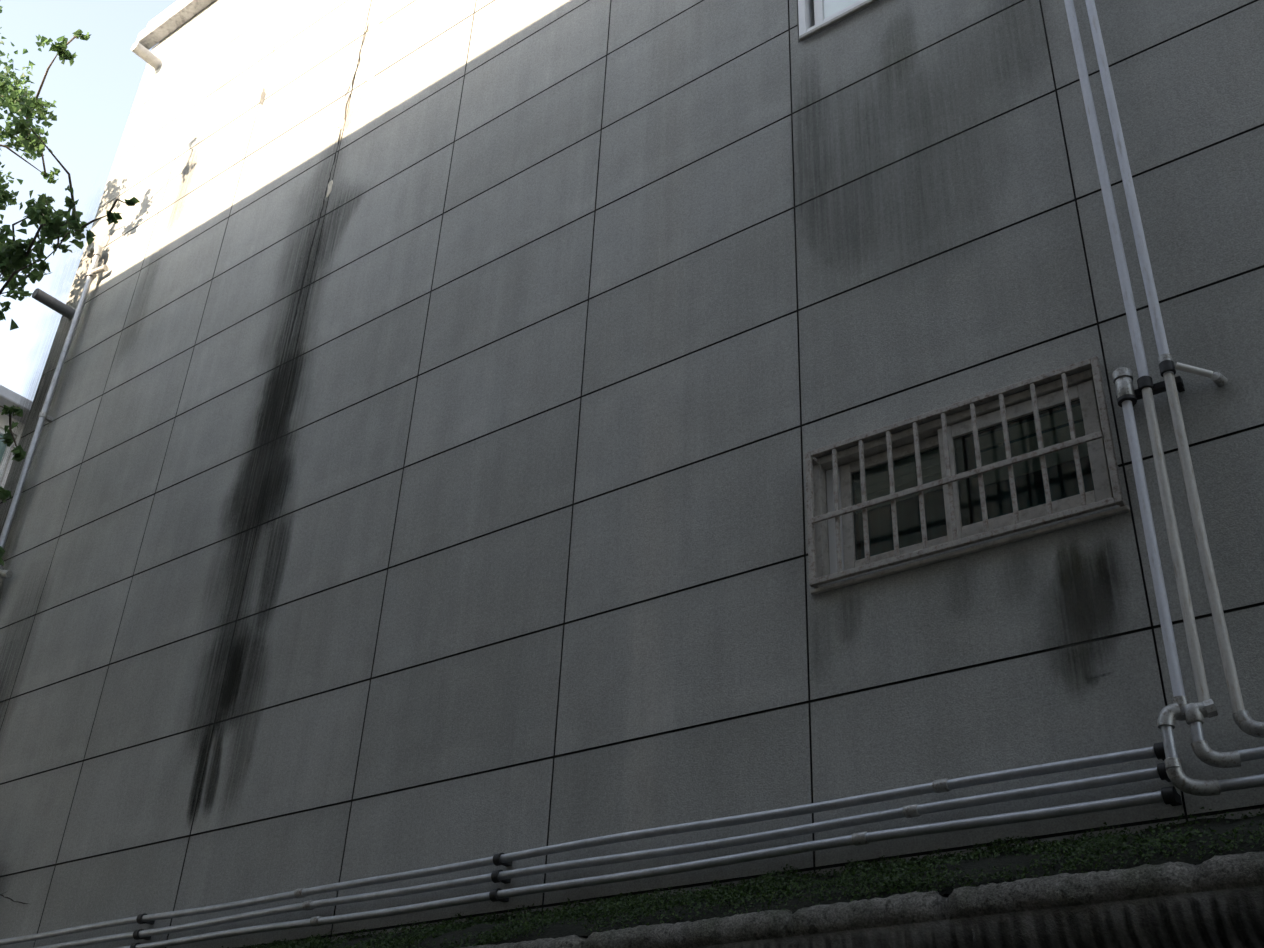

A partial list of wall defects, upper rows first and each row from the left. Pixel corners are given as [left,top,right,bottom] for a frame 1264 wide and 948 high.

damp [189,640,258,819]
damp [1036,896,1264,948]